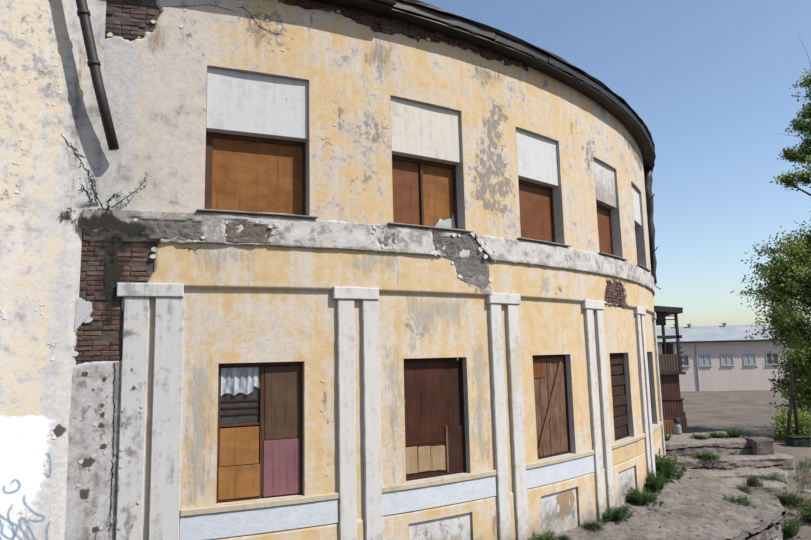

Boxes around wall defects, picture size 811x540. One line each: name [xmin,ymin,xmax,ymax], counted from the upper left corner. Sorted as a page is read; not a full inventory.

flaking render [105,0,162,41]
crack [161,4,284,35]
flaking render [238,0,528,71]
peeling [469,100,516,220]
spalling [432,231,496,296]
flaking render [604,280,626,308]
flaking render [72,218,206,515]
spalling [51,424,66,439]
crack [95,364,122,539]
peeling [556,490,575,520]